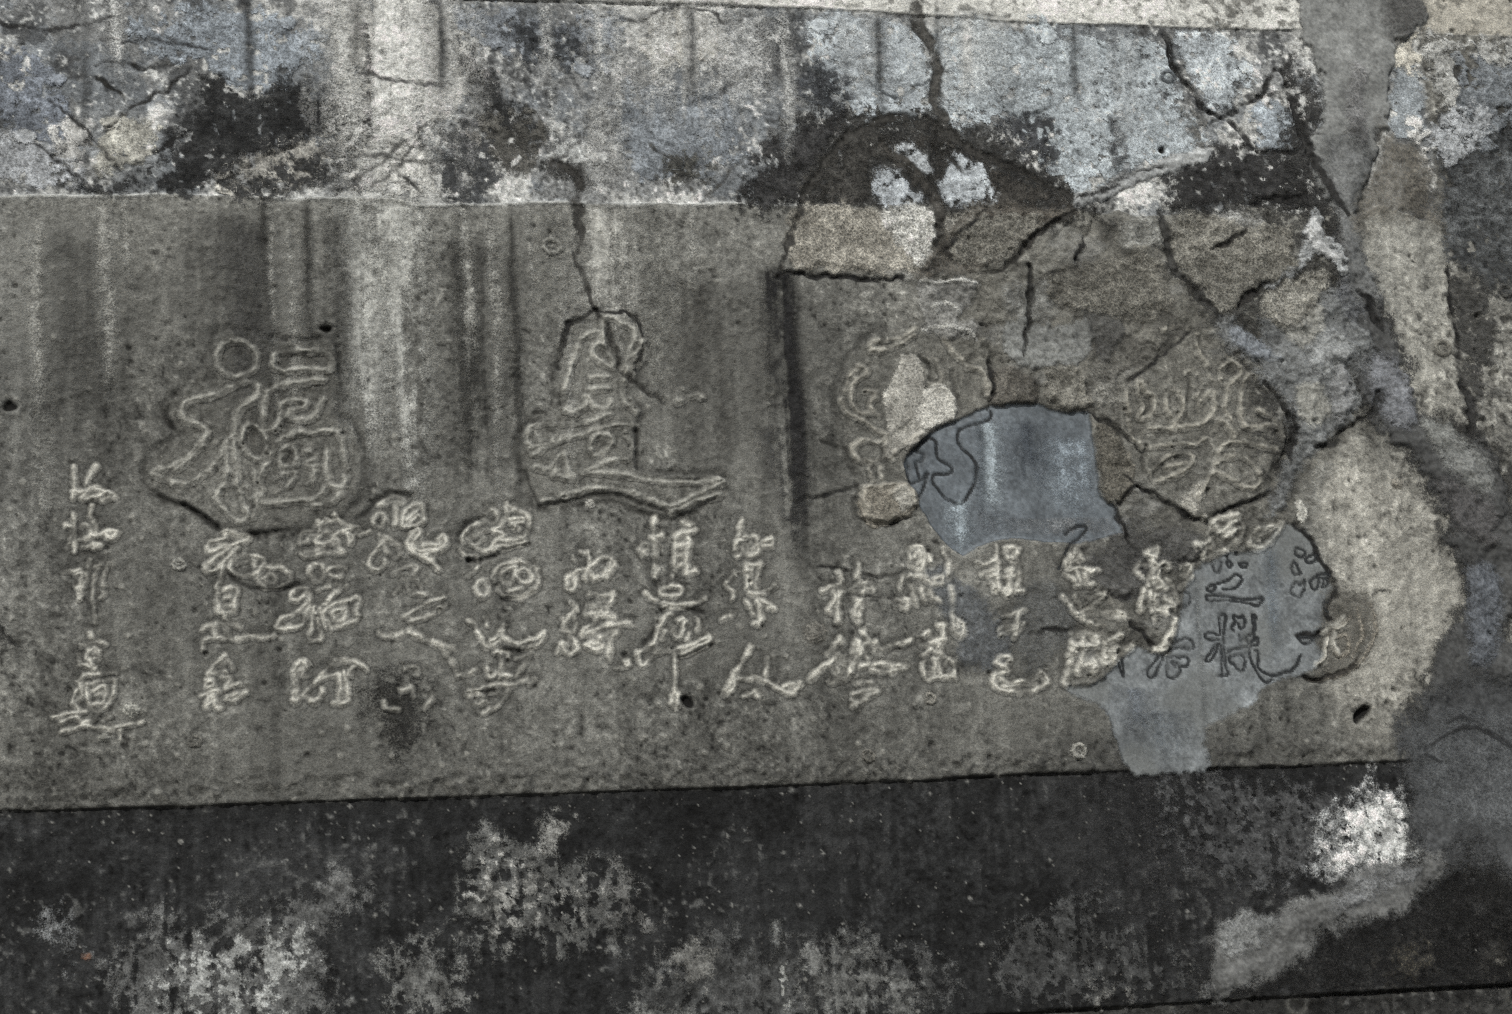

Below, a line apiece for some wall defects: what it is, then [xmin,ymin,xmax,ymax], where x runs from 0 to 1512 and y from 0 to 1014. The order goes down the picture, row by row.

damp [27,0,1117,492]
crack [532,126,661,401]
damp [759,269,810,550]
crack [777,0,1163,410]
crack [1127,211,1271,381]
crack [1089,380,1385,543]
damp [1143,51,1344,506]
crack [1165,38,1350,250]
crack [1292,523,1337,639]
damp [1350,365,1471,819]
damp [1418,100,1512,521]
damp [1180,835,1512,1014]